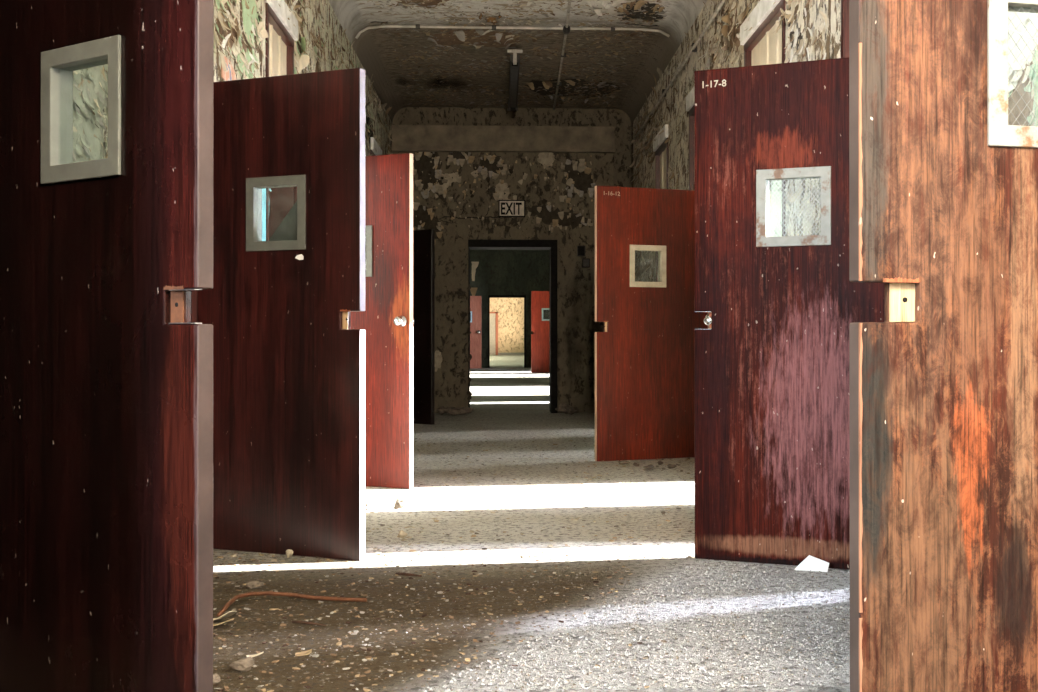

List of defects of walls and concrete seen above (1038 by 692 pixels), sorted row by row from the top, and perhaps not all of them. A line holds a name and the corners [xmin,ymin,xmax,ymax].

peeling [214,0,269,80]
peeling [366,0,667,108]
peeling [629,0,758,190]
peeling [771,0,827,63]
peeling [413,152,595,242]
peeling [635,251,655,282]